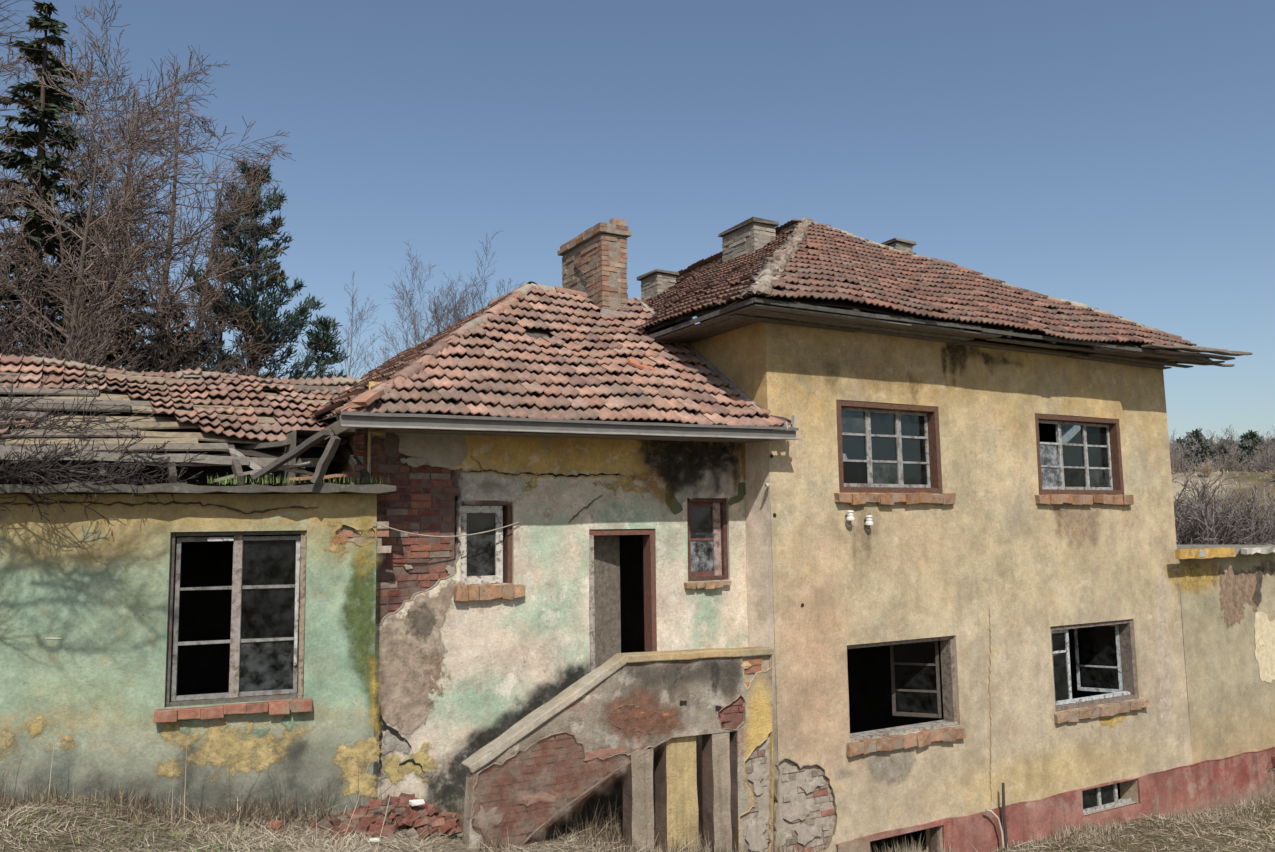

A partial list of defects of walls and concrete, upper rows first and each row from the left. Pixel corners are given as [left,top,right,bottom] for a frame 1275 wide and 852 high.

water stain [638,435,738,491]
flaking render [325,428,537,798]
peeling [1218,546,1275,683]
peeling [153,715,308,781]
water stain [476,734,492,747]
water stain [564,672,576,690]
flaking render [467,700,687,848]
flaking render [738,730,849,852]